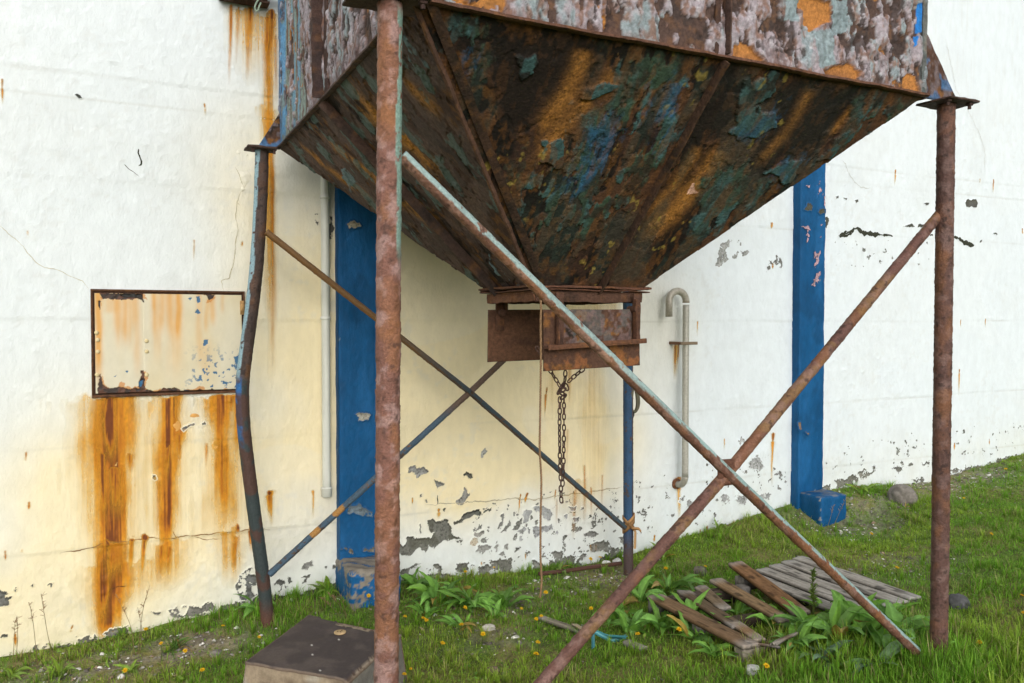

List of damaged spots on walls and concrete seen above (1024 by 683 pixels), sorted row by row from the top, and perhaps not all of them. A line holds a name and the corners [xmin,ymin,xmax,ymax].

rust [230,5,276,136]
rust [266,153,274,283]
peeling [715,240,749,267]
peeling [766,254,783,273]
spalling [801,181,859,286]
rust [78,395,187,636]
peeling [149,566,259,620]
rust [204,394,251,570]
peeling [272,545,375,600]
peeling [400,464,623,578]
peeling [822,456,877,490]
peeling [890,433,930,484]